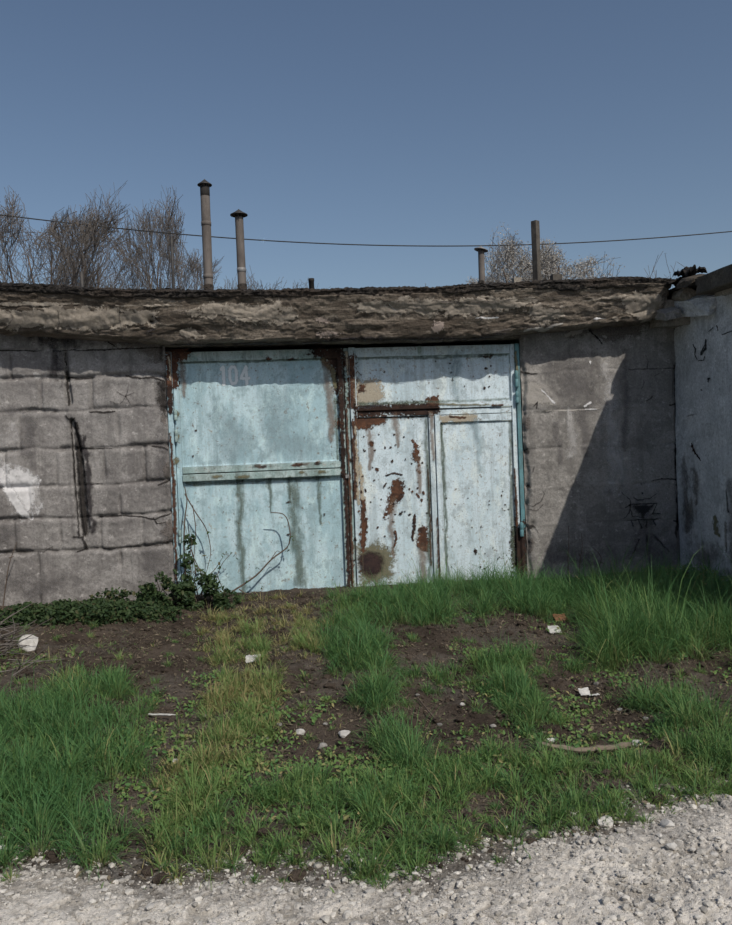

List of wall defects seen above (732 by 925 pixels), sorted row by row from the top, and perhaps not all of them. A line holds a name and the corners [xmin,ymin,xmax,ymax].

peeling [0,298,299,339]
peeling [315,317,344,339]
peeling [347,289,668,344]
crack [0,312,546,552]
corrosion [165,345,504,588]
damp [186,476,329,593]
corrosion [509,468,527,579]